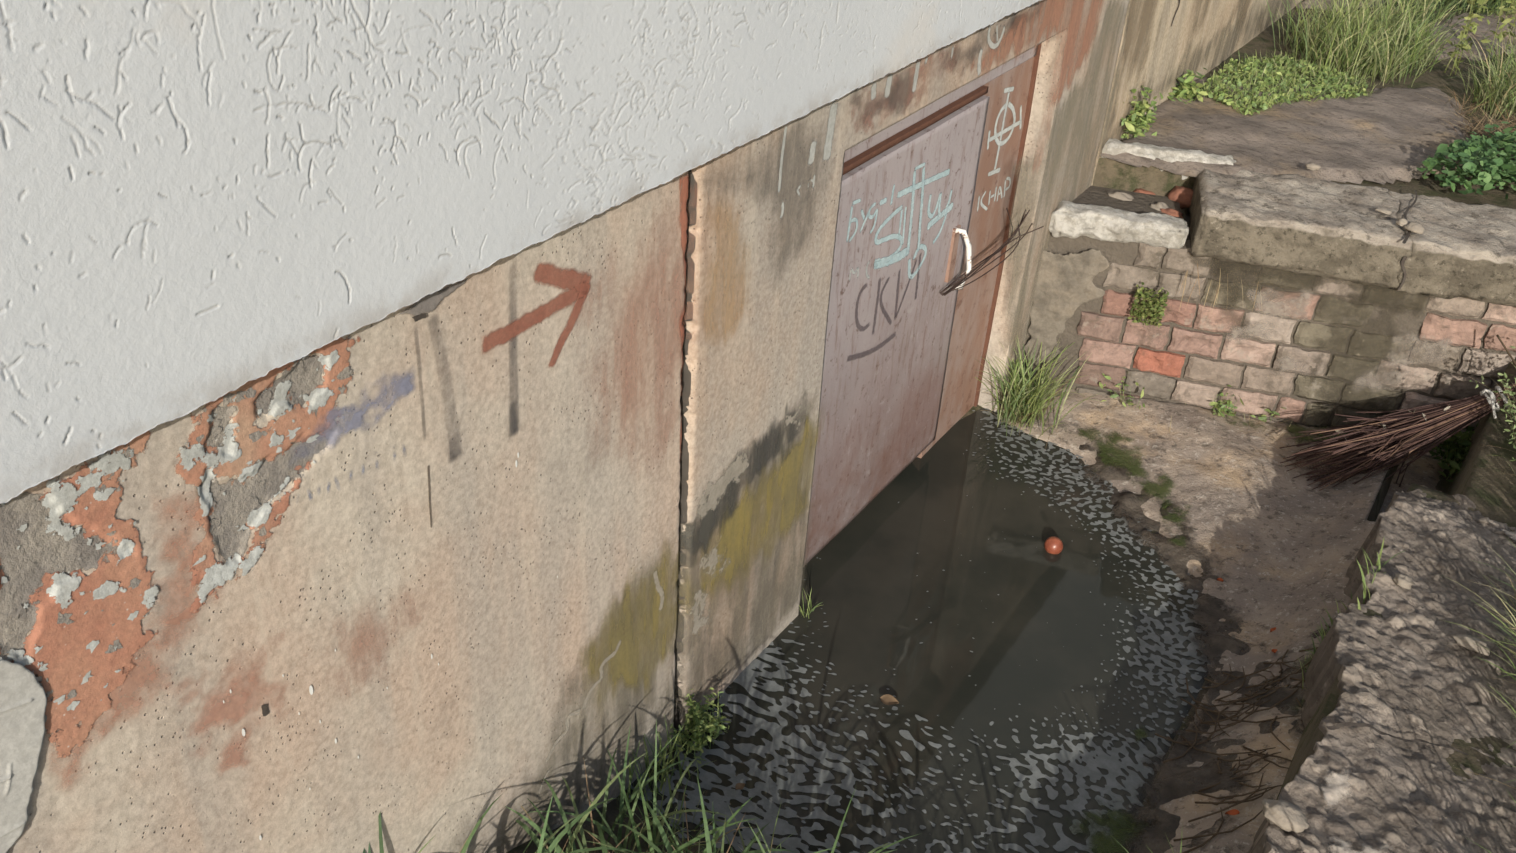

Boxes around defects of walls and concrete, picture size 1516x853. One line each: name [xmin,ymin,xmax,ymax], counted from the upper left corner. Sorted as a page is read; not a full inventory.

crack [1398,190,1418,291]
peeling [0,430,159,758]
peeling [174,337,361,613]
damp [517,407,817,844]